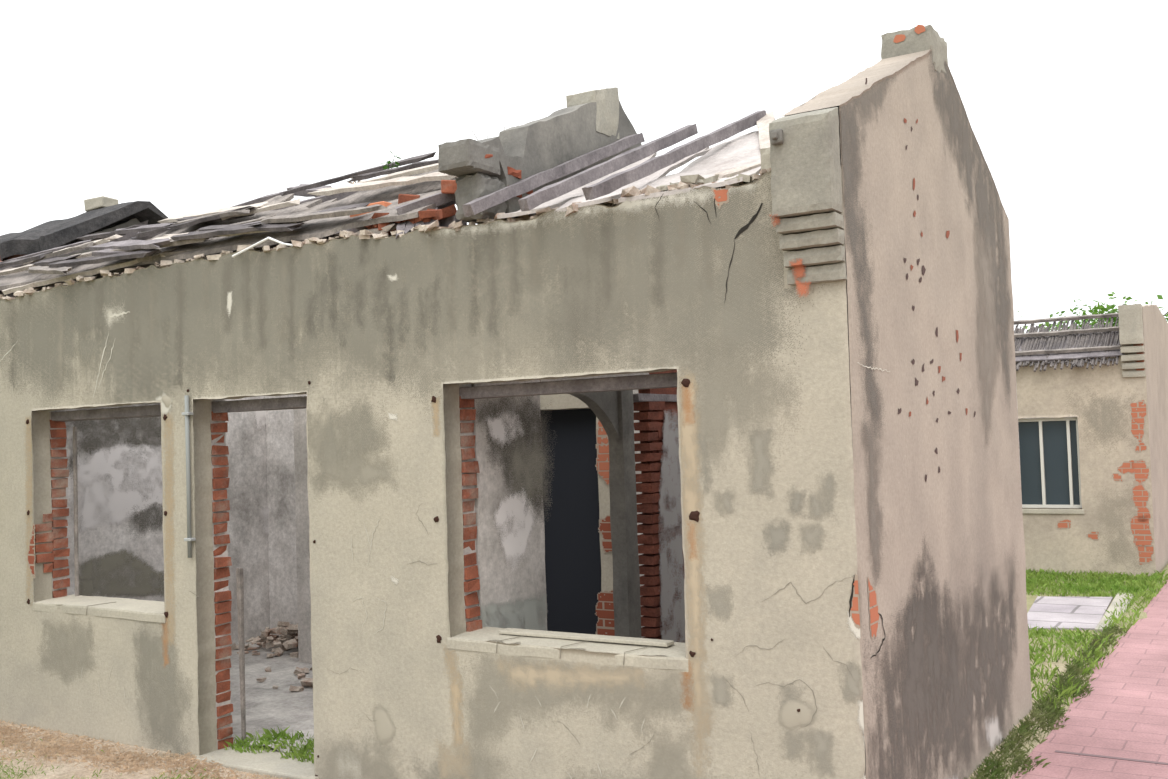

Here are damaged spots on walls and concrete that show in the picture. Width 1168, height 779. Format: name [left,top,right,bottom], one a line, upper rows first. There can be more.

peeling [425,181,760,240]
crack [724,203,763,303]
damp [0,173,839,556]
peeling [71,443,163,533]
flaking render [1112,399,1154,565]
peeling [79,548,164,598]
corrosion [678,367,716,777]
crack [760,575,886,681]
flaking render [847,574,880,639]
damp [835,534,1022,779]
damp [315,653,837,779]
crack [721,674,817,776]